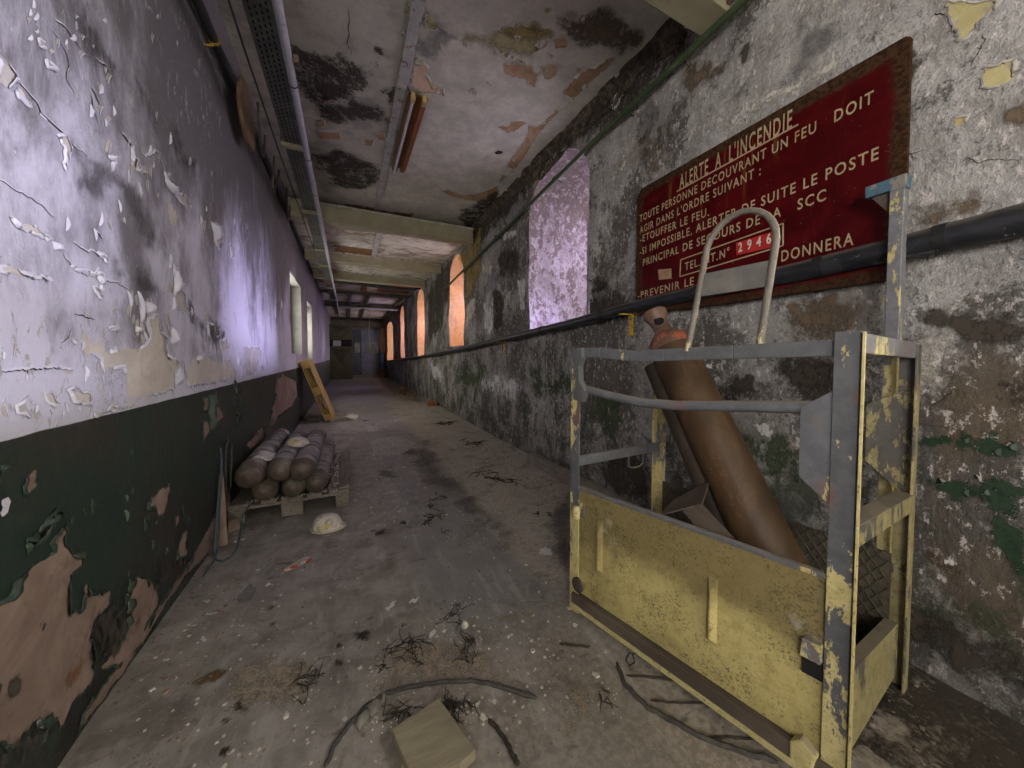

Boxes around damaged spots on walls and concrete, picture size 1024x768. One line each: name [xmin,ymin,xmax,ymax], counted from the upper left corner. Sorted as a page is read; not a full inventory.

crack [20,82,87,156]
crack [52,19,165,172]
mould [291,45,395,124]
spalling [440,17,695,238]
crack [0,179,54,217]
peeling [105,132,239,259]
damp [426,186,526,338]
crack [2,314,95,378]
peeling [0,254,263,441]
damp [775,357,834,400]
damp [920,308,1024,385]
peeling [0,477,231,752]